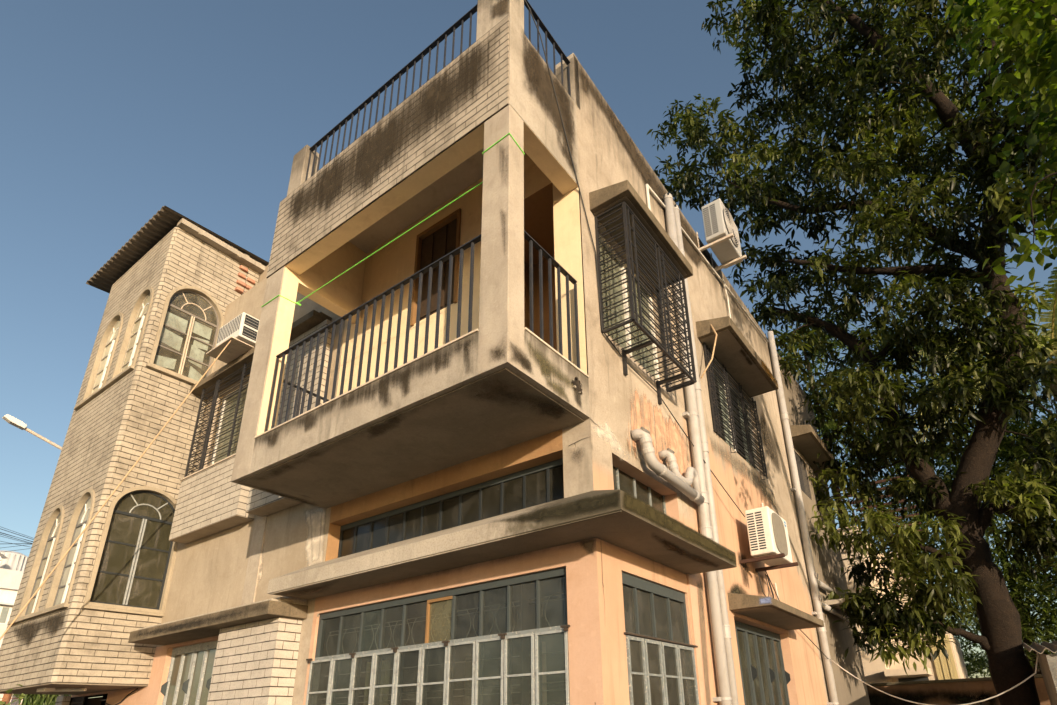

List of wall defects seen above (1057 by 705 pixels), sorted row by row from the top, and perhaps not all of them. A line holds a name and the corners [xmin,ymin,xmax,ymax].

water stain [290,43,489,215]
water stain [524,39,575,171]
water stain [581,72,666,212]
water stain [679,212,716,267]
water stain [299,344,469,430]
water stain [513,343,575,398]
water stain [507,493,765,594]